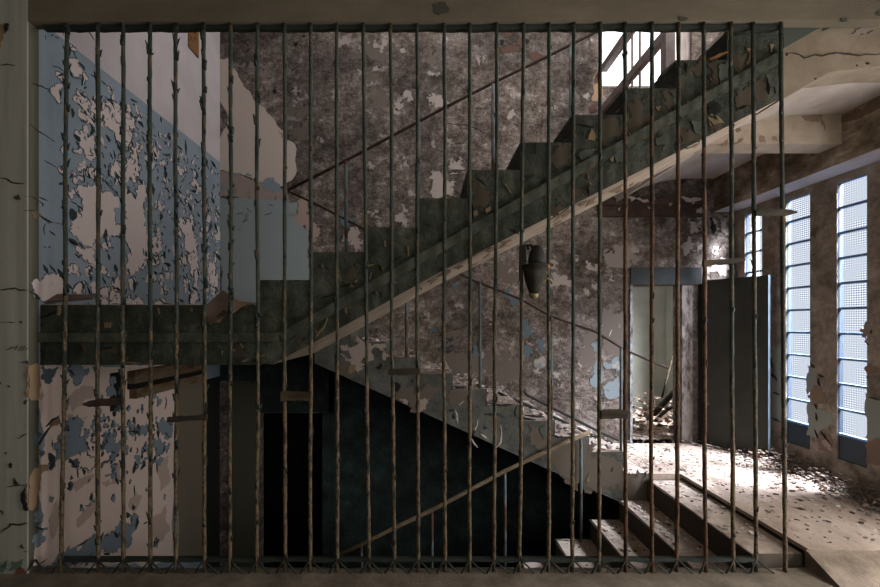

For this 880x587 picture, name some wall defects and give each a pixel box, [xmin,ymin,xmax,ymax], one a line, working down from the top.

crack [792,31,879,59]
flaking render [393,90,413,116]
flaking render [427,93,449,109]
spalling [583,71,603,101]
flaking render [30,33,321,327]
flaking render [429,156,465,198]
flaking render [342,224,369,252]
flaking render [550,259,572,290]
spalling [859,321,873,345]
spalling [340,337,388,375]
peeling [807,364,833,451]
flaking render [3,348,174,574]